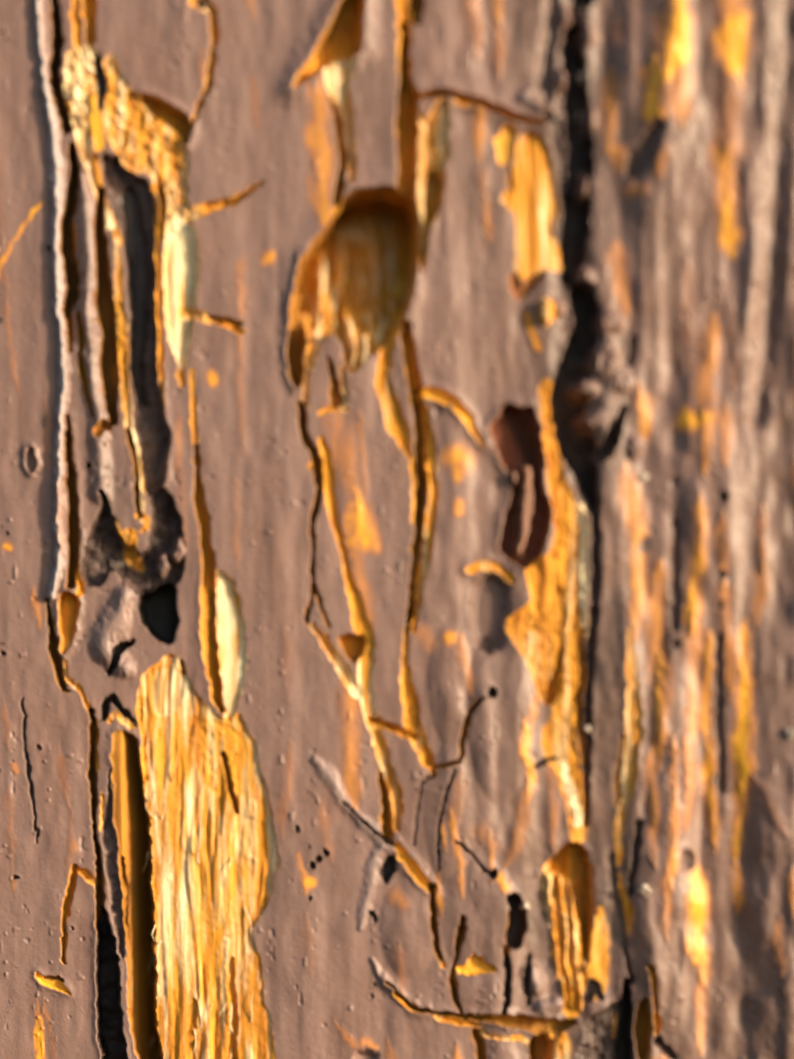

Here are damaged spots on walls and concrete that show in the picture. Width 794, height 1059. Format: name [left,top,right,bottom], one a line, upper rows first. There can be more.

crack [19,696,40,846]
peeling [44,590,95,712]
peeling [63,0,282,1059]
peeling [285,0,647,1059]
crack [384,695,680,1059]